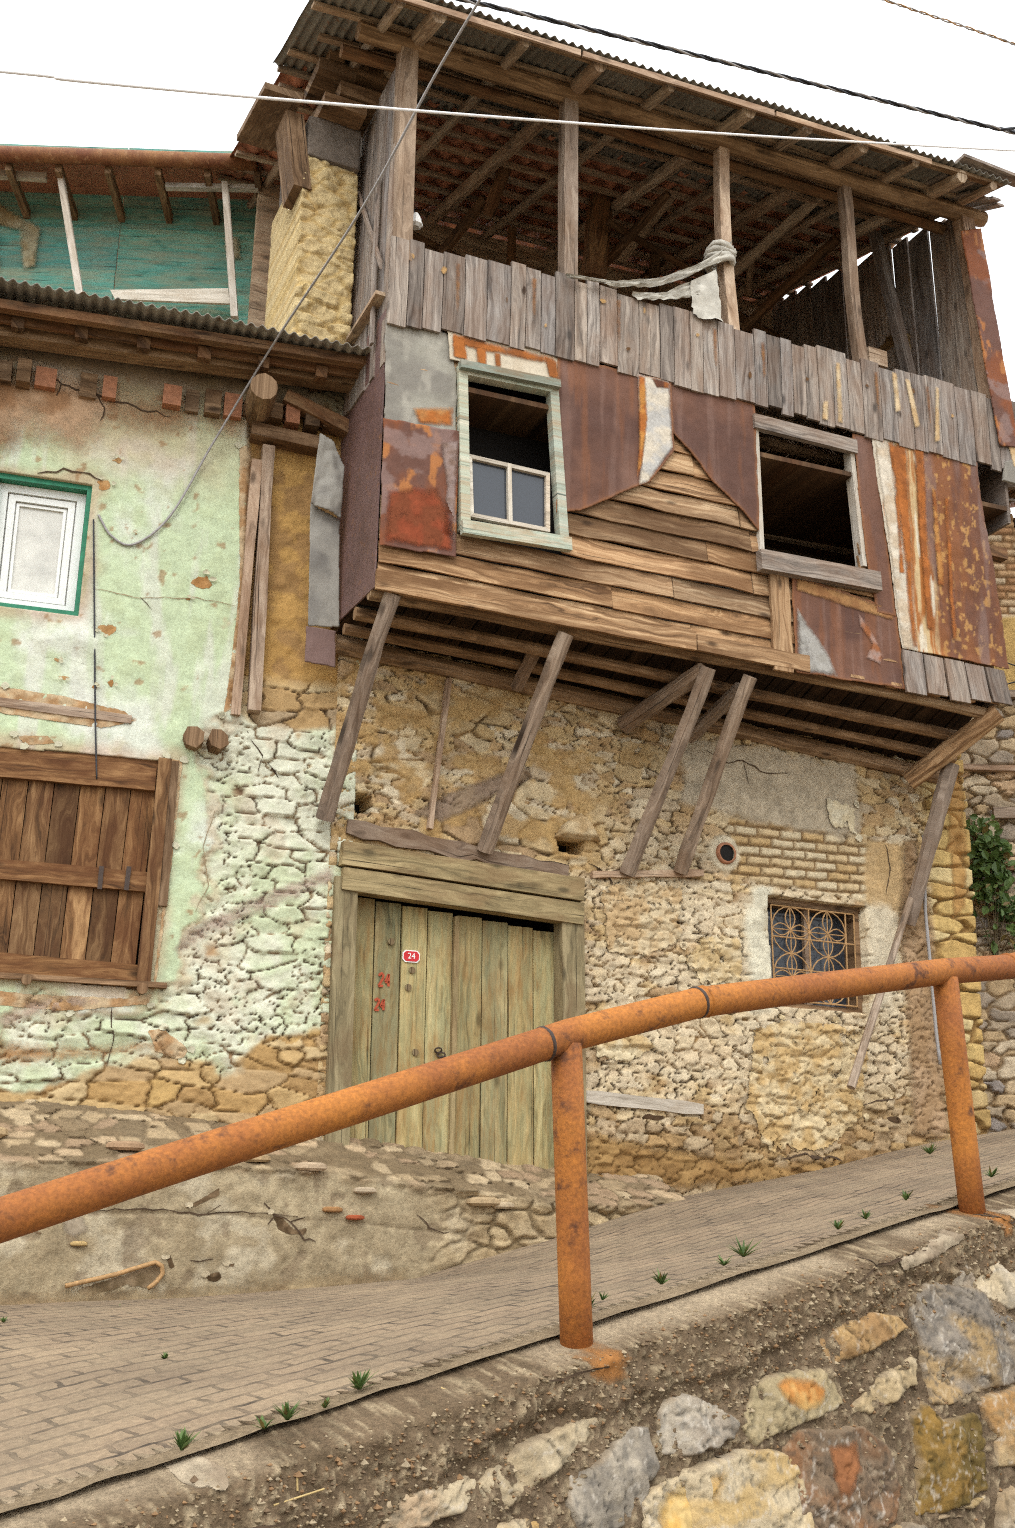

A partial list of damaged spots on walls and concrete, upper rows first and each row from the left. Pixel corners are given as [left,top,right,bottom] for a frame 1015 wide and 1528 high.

corrosion [387,409,457,549]
corrosion [797,444,956,663]
crack [707,750,776,783]
corrosion [581,1347,625,1380]